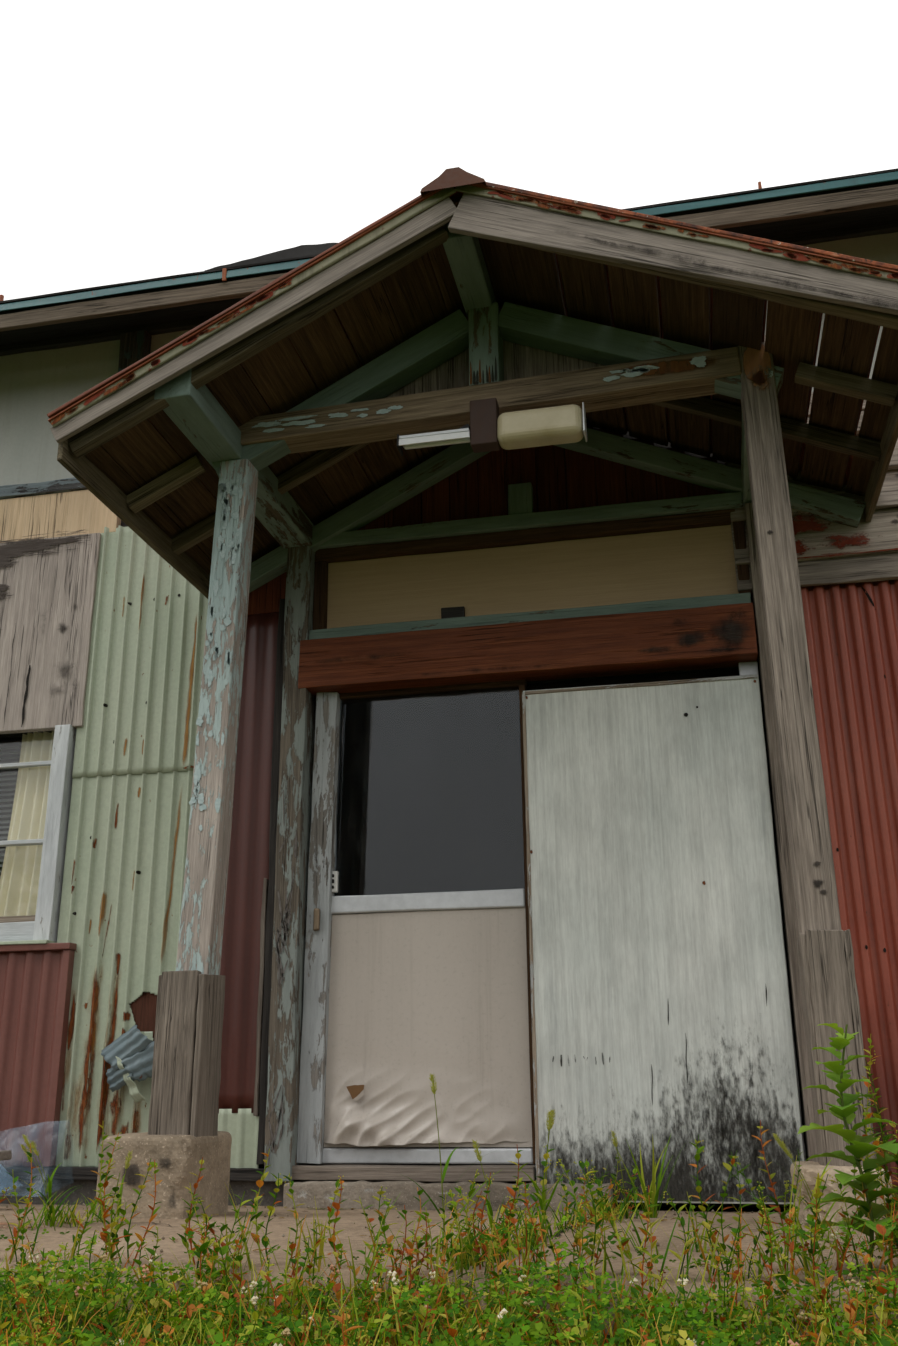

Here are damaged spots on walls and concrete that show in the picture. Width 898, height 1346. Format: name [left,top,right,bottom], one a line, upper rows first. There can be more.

rust [488,191,709,237]
rust [749,243,898,279]
rust [182,278,292,346]
peeling [218,473,243,567]
peeling [792,511,898,559]
rust [122,577,180,626]
peeling [204,579,231,687]
peeling [189,707,225,831]
peeling [275,790,297,987]
rust [62,893,139,1159]
damp [539,1039,801,1202]